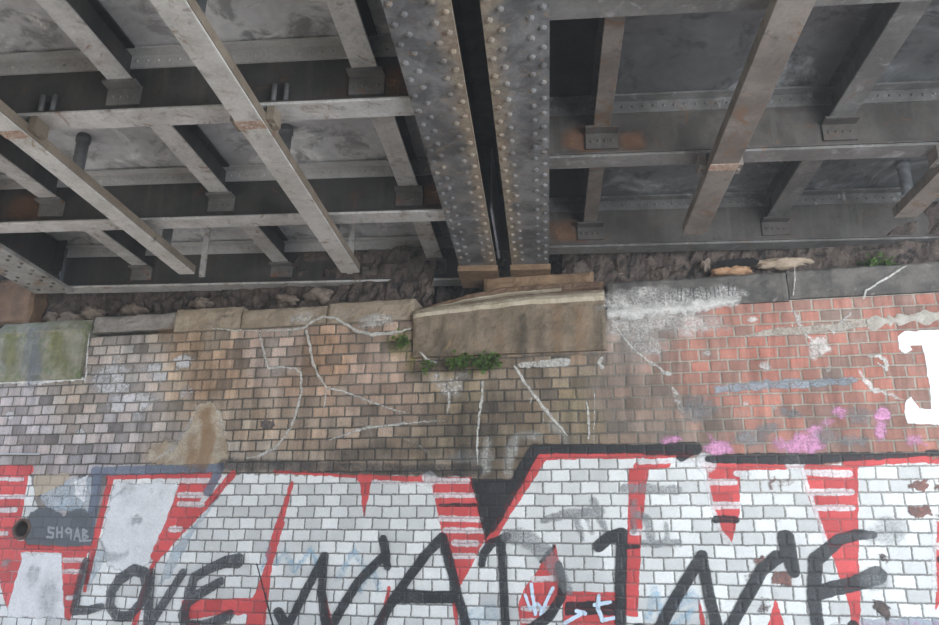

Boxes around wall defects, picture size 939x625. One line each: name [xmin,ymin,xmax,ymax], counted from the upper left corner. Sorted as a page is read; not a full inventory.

crack [863,266,906,299]
leakage [604,287,739,354]
peeling [0,333,194,416]
crack [212,315,444,459]
crack [514,365,567,435]